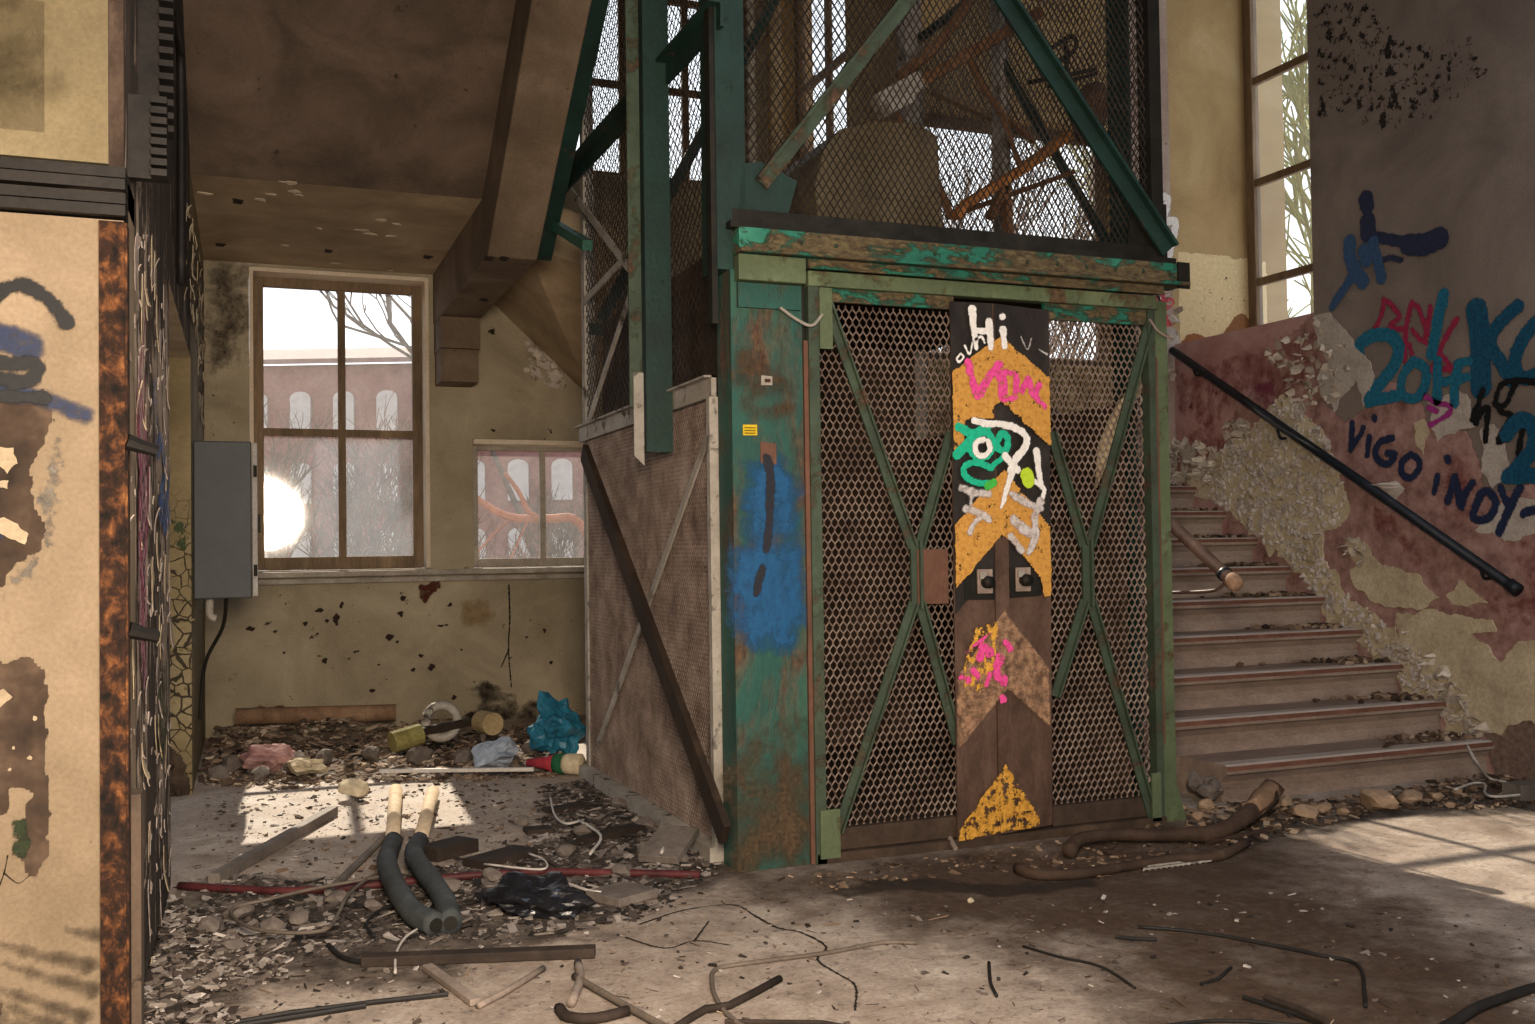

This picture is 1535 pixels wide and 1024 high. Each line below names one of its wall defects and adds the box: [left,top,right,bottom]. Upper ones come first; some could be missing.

peeling [1156,277,1249,404]
flaking render [0,389,52,587]
flaking render [1169,312,1535,774]
flaking render [0,657,52,876]